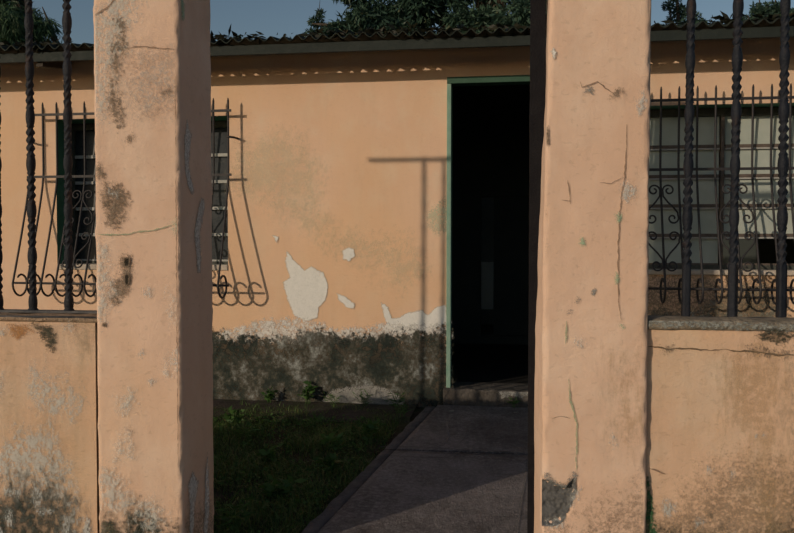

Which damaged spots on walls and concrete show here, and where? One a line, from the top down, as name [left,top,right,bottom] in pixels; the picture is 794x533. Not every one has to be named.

leakage [106,17,128,128]
leakage [96,162,133,229]
leakage [107,255,133,306]
peeling [216,252,452,346]
peeling [342,248,355,262]
leakage [648,276,794,346]
leakage [212,324,455,408]
crack [648,344,794,360]
leakage [0,472,90,533]
leakage [99,459,212,533]
spalling [542,471,582,528]
leakage [594,461,794,533]